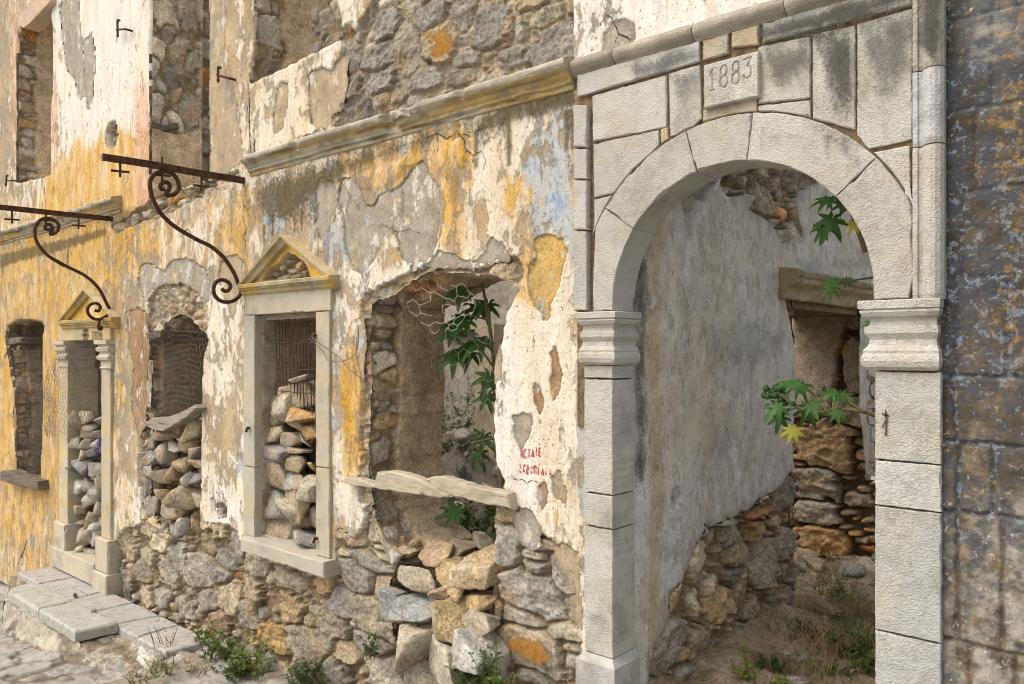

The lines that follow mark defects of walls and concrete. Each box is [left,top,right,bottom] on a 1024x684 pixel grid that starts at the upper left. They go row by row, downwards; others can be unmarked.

peeling [60,0,96,110]
peeling [113,0,243,233]
spalling [335,0,574,127]
crack [422,128,488,167]
spalling [117,161,583,684]